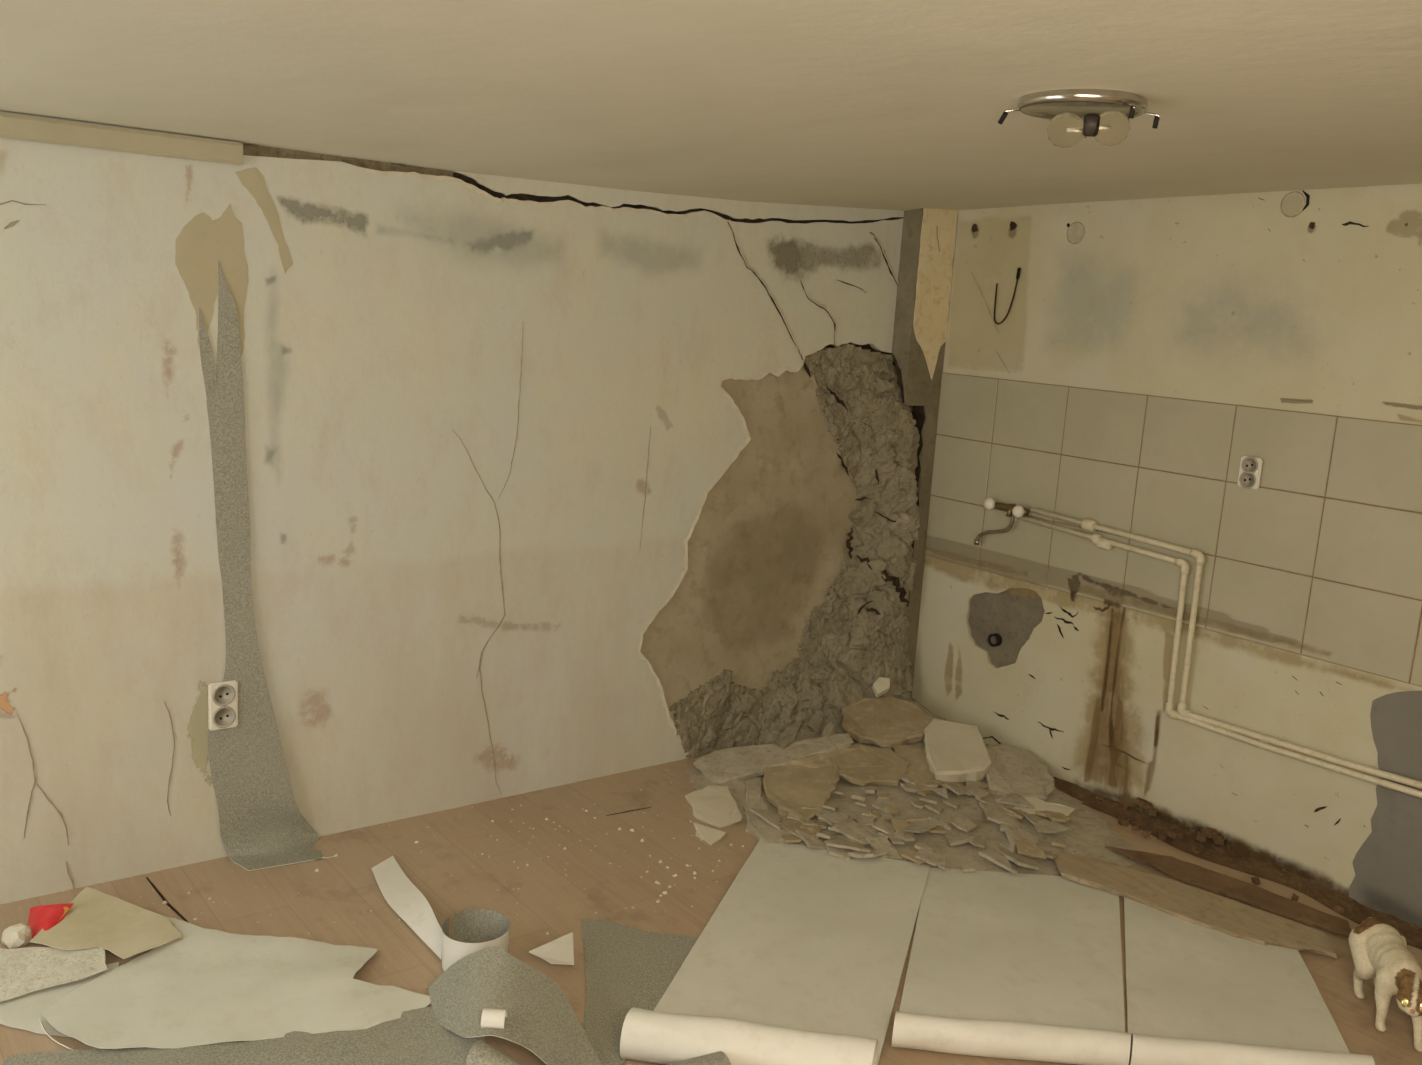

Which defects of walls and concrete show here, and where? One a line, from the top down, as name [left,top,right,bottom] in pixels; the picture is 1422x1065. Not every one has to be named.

peeling [175,204,249,356]
peeling [235,167,293,273]
crack [243,145,899,378]
crack [452,335,523,794]
spalling [638,349,859,739]
spalling [968,588,1110,668]
water stain [1079,573,1170,608]
crack [17,715,75,889]
peeling [188,683,212,786]